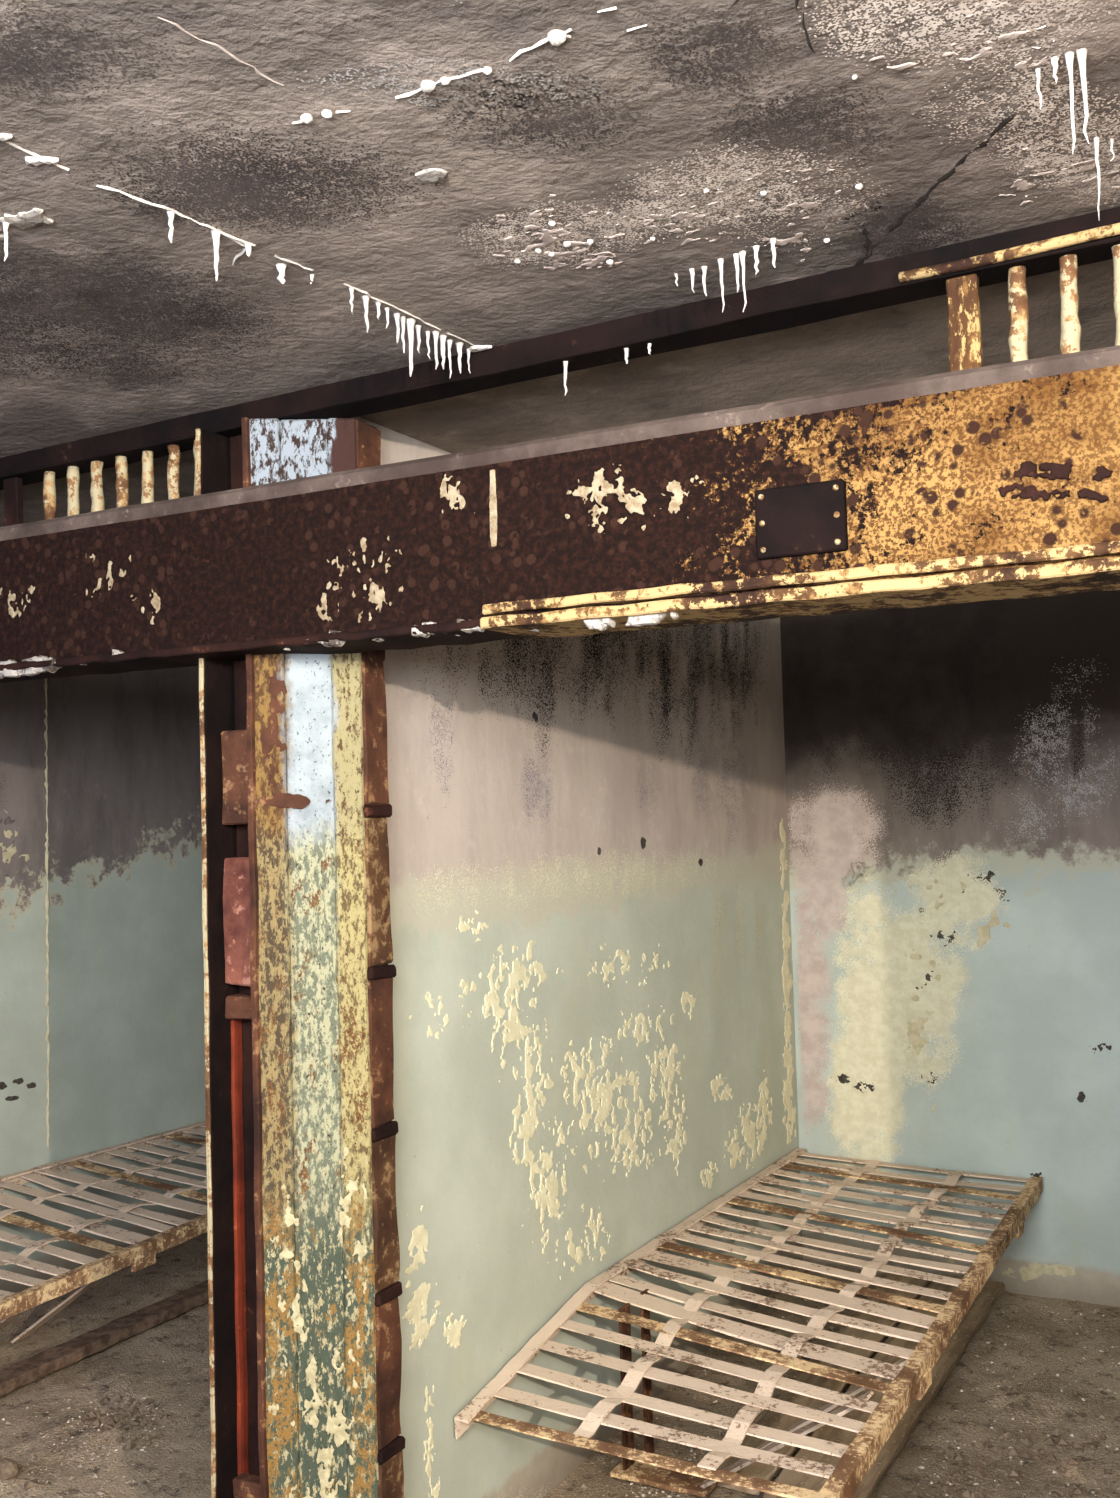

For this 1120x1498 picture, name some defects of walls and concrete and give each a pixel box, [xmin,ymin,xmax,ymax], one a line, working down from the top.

water stain [0,0,1120,272]
crack [854,115,1015,266]
water stain [0,208,327,396]
corrosion [998,461,1117,503]
corrosion [0,655,87,679]
corrosion [255,675,330,809]
corrosion [584,612,679,631]
water stain [405,600,1120,856]
peeling [408,940,696,1280]
peeling [700,818,796,1189]
peeling [824,850,1011,1184]
peeling [402,1205,467,1351]